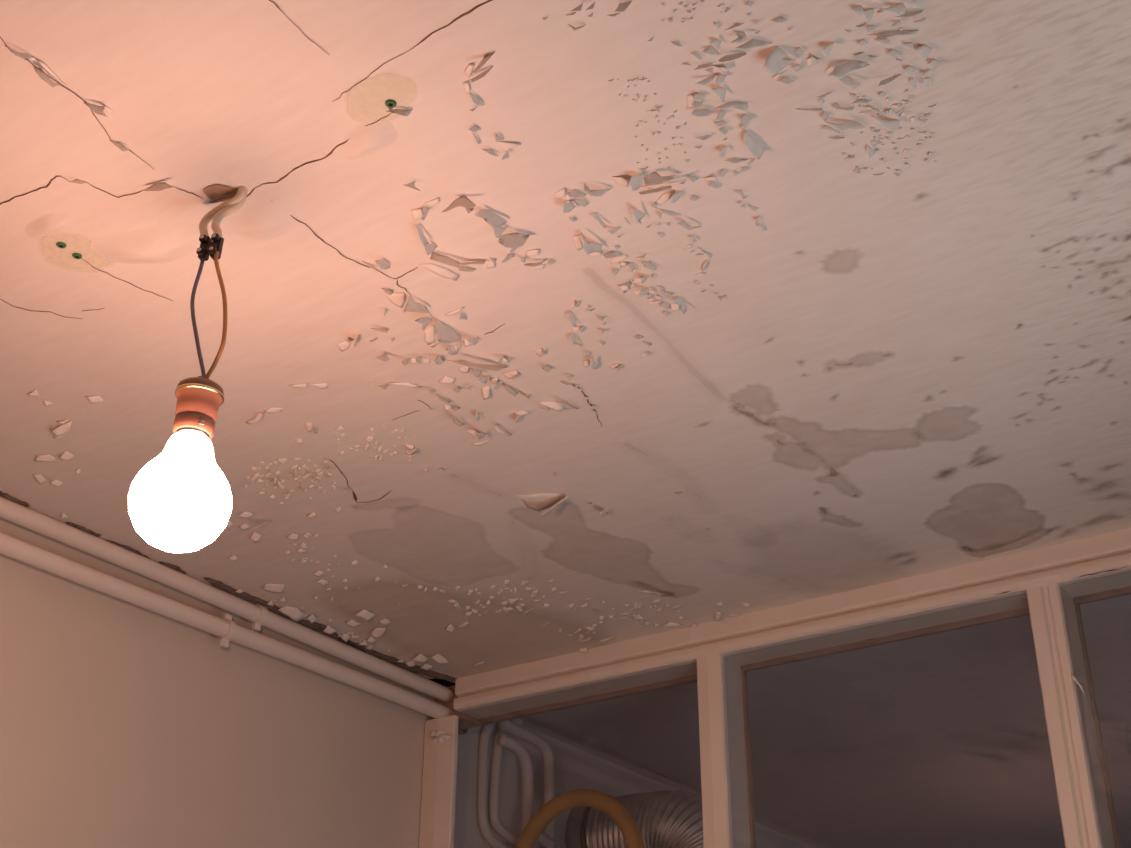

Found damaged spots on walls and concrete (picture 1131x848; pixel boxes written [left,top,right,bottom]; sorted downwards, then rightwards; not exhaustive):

crack [0,37,150,166]
crack [269,0,329,55]
crack [332,0,493,102]
peeling [463,51,496,111]
crack [0,176,141,205]
crack [83,259,172,301]
crack [247,114,418,292]
peeling [404,181,556,281]
peeling [554,0,941,317]
peeling [338,288,623,447]
spalling [61,513,186,574]
spalling [204,532,456,681]